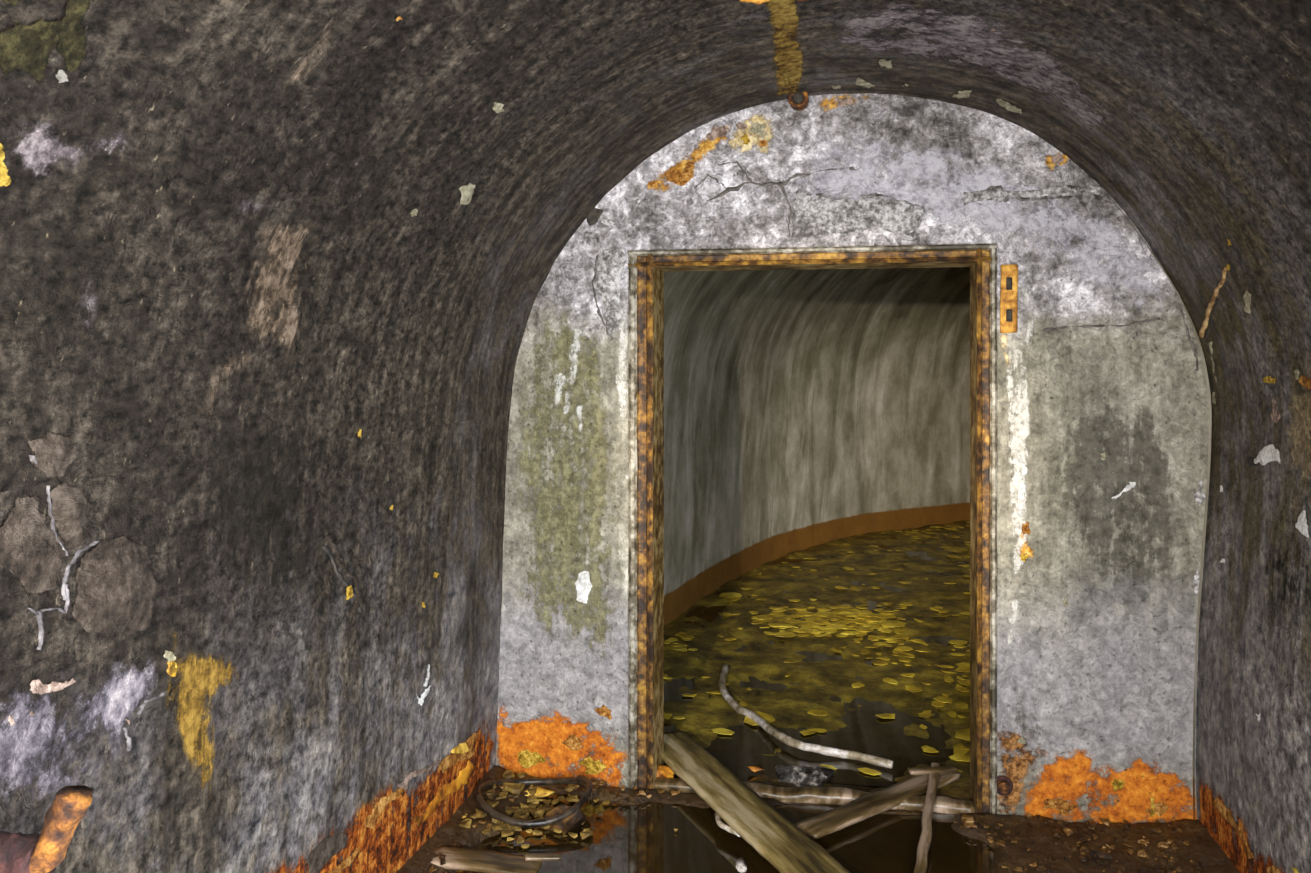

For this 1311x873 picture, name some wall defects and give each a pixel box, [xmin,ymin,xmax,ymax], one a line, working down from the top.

peeling [0,0,90,83]
corrosion [766,0,803,95]
spalling [0,143,11,187]
damp [520,317,628,657]
corrosion [997,731,1048,815]